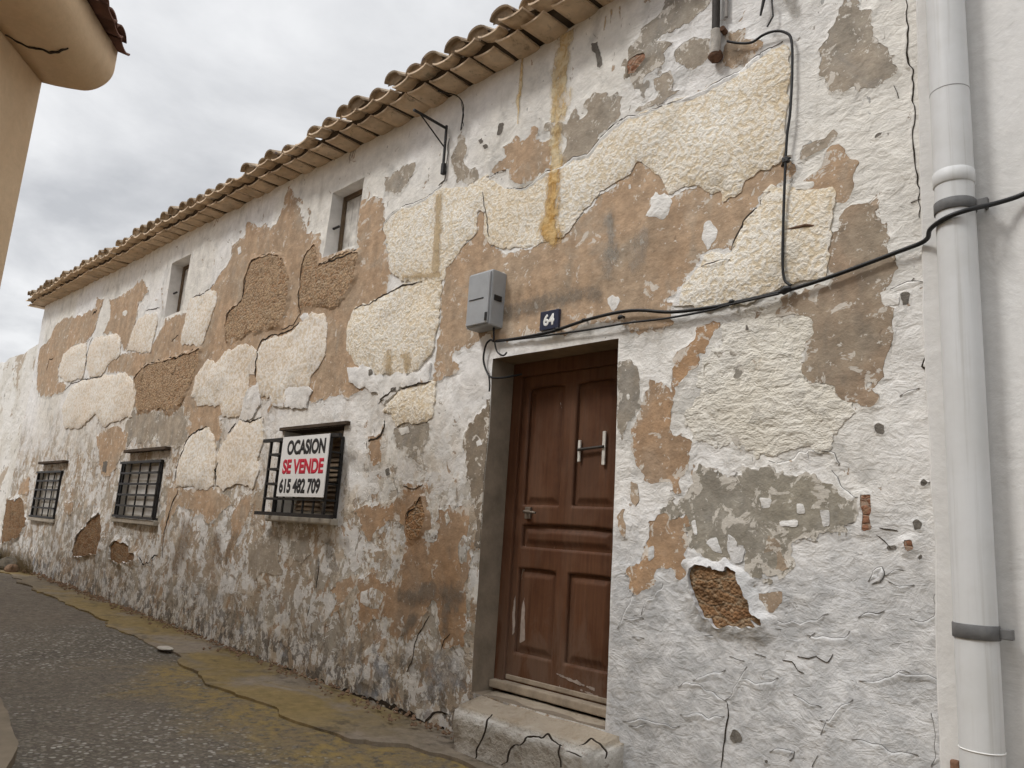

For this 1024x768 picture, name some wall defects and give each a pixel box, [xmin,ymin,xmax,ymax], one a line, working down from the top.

crack [5,34,69,54]
rust [539,30,574,247]
crack [893,0,921,217]
peeling [36,156,422,480]
peeling [432,123,927,650]
flaking render [1,476,30,548]
flaking render [70,504,141,574]
leakage [173,519,190,573]
peeling [327,392,491,660]
crack [475,714,493,759]
crack [501,733,608,768]
crack [617,526,940,767]